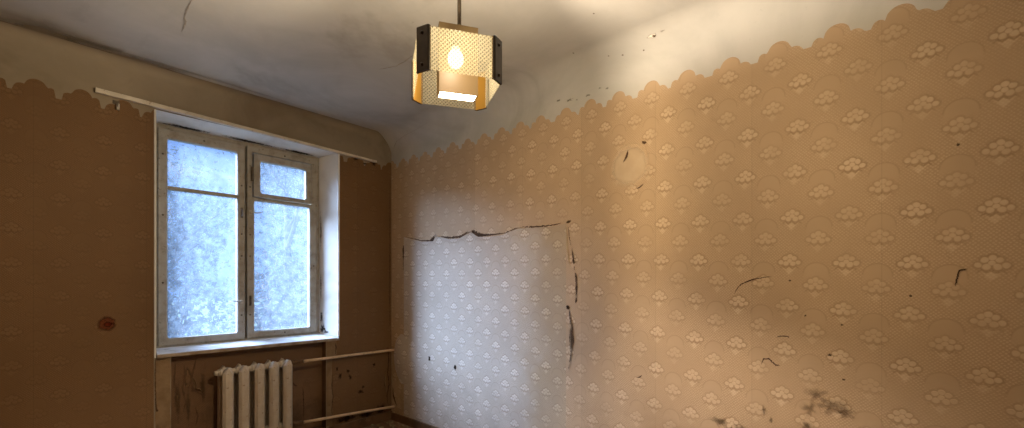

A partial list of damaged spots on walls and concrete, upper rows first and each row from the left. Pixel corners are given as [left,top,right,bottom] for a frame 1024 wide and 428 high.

crack [182,0,192,30]